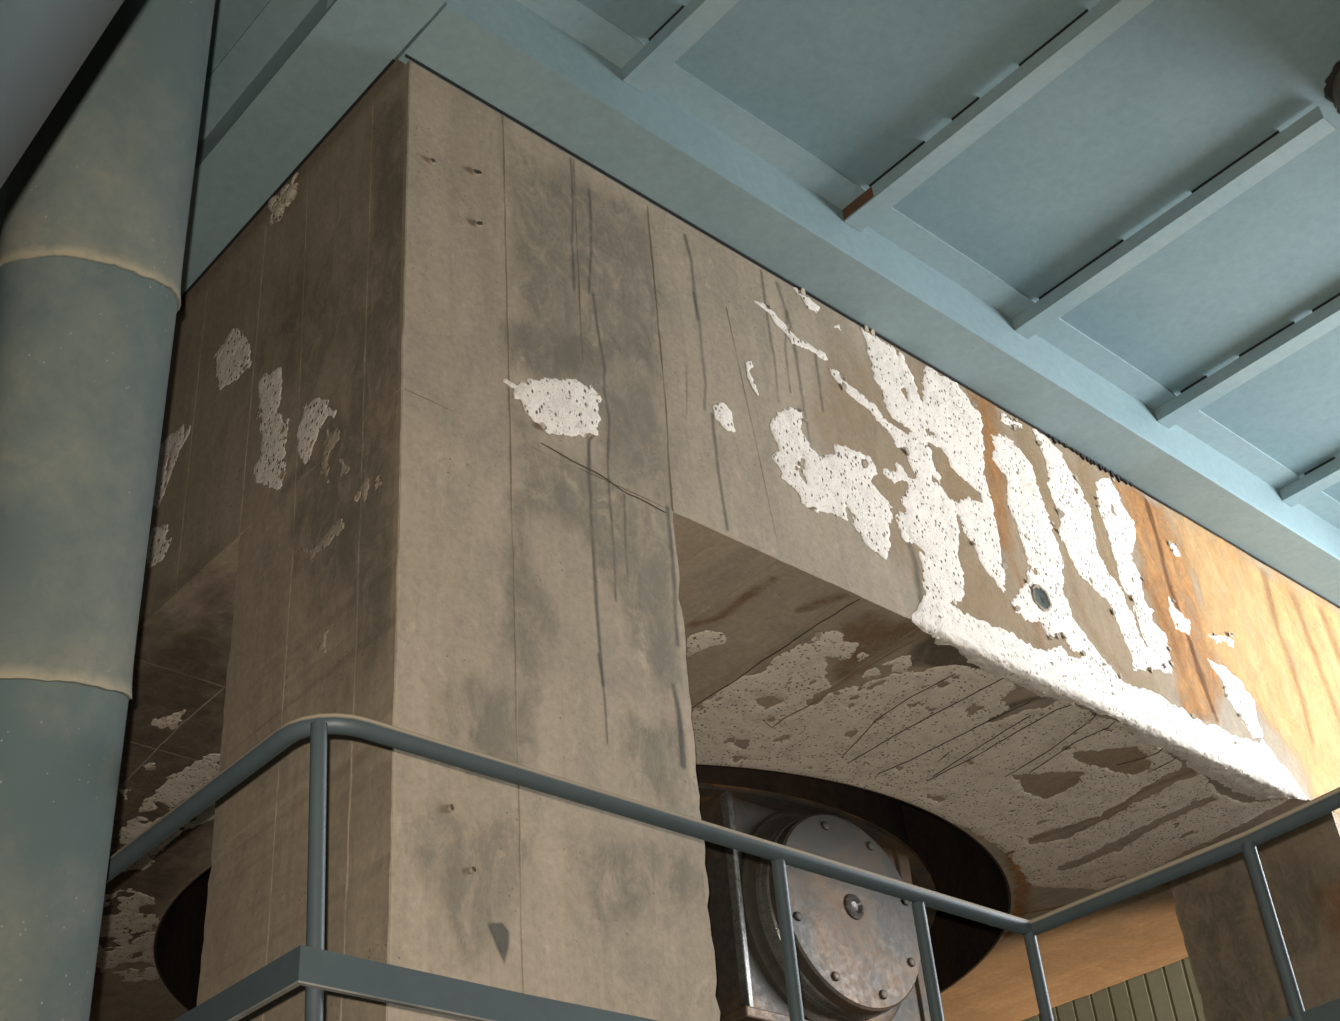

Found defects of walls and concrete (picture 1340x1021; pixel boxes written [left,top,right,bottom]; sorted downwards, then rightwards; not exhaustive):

peeling [792,287,820,313]
peeling [212,328,350,490]
peeling [503,377,604,438]
peeling [153,424,191,509]
crack [541,443,666,513]
peeling [686,301,1307,891]
rust [1115,482,1340,797]
peeling [118,754,220,850]
crack [842,674,1116,781]
crack [1116,748,1177,771]
peeling [96,888,160,983]
rust [1004,854,1065,937]